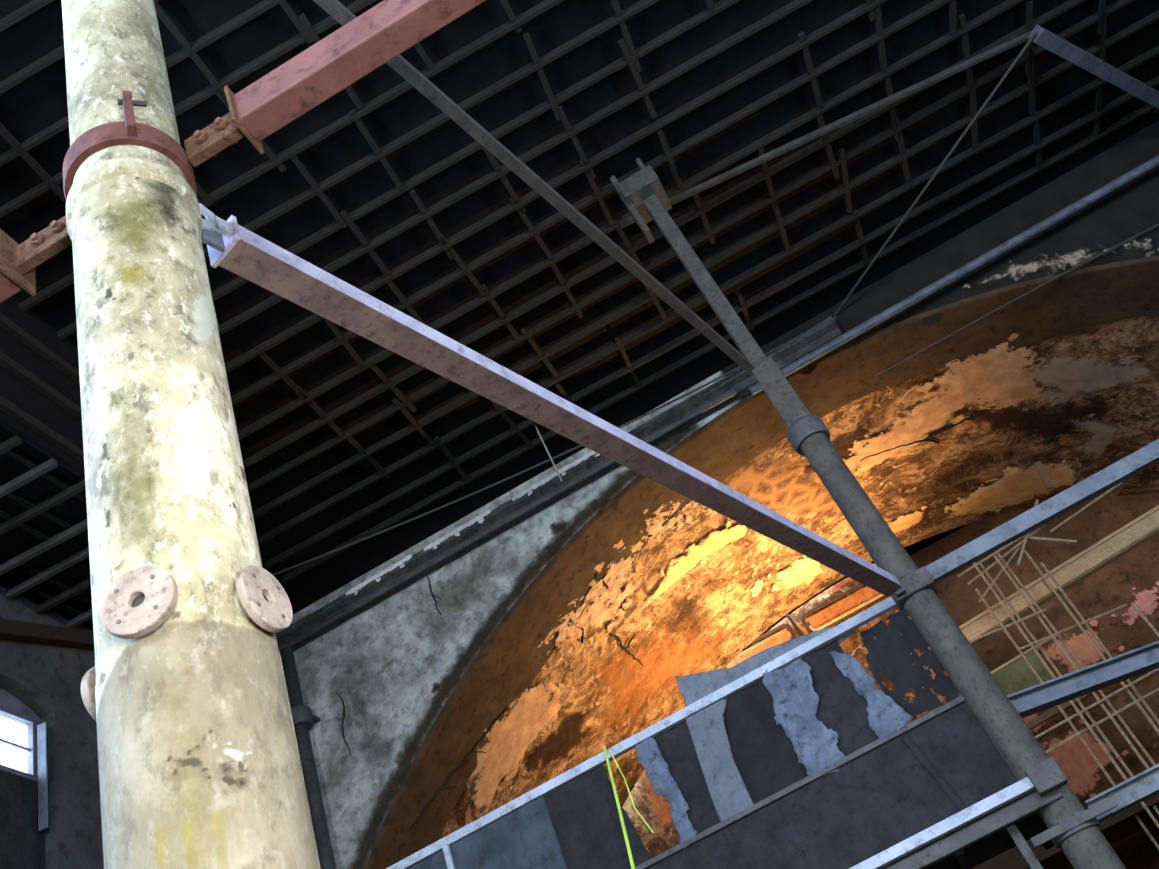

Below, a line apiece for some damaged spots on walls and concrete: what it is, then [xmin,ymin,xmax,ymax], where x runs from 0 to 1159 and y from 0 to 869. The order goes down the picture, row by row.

flaking render [833,333,1157,516]
peeling [512,451,600,501]
peeling [727,460,843,516]
flaking render [888,506,927,533]
spalling [538,500,749,660]
flaking render [745,555,823,597]
flaking render [1036,580,1159,672]
flaking render [452,682,590,826]
flaking render [1022,671,1159,798]